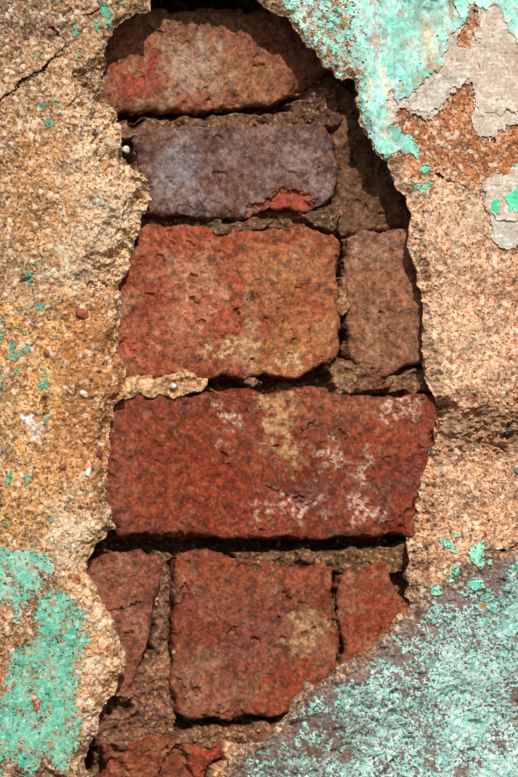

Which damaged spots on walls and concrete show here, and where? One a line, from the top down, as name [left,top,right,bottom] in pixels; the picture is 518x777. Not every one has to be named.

peeling [93,1,113,31]
crack [0,27,65,115]
peeling [281,0,518,195]
spalling [268,185,315,211]
peeling [481,162,518,250]
spalling [77,236,122,286]
peeling [245,532,518,777]